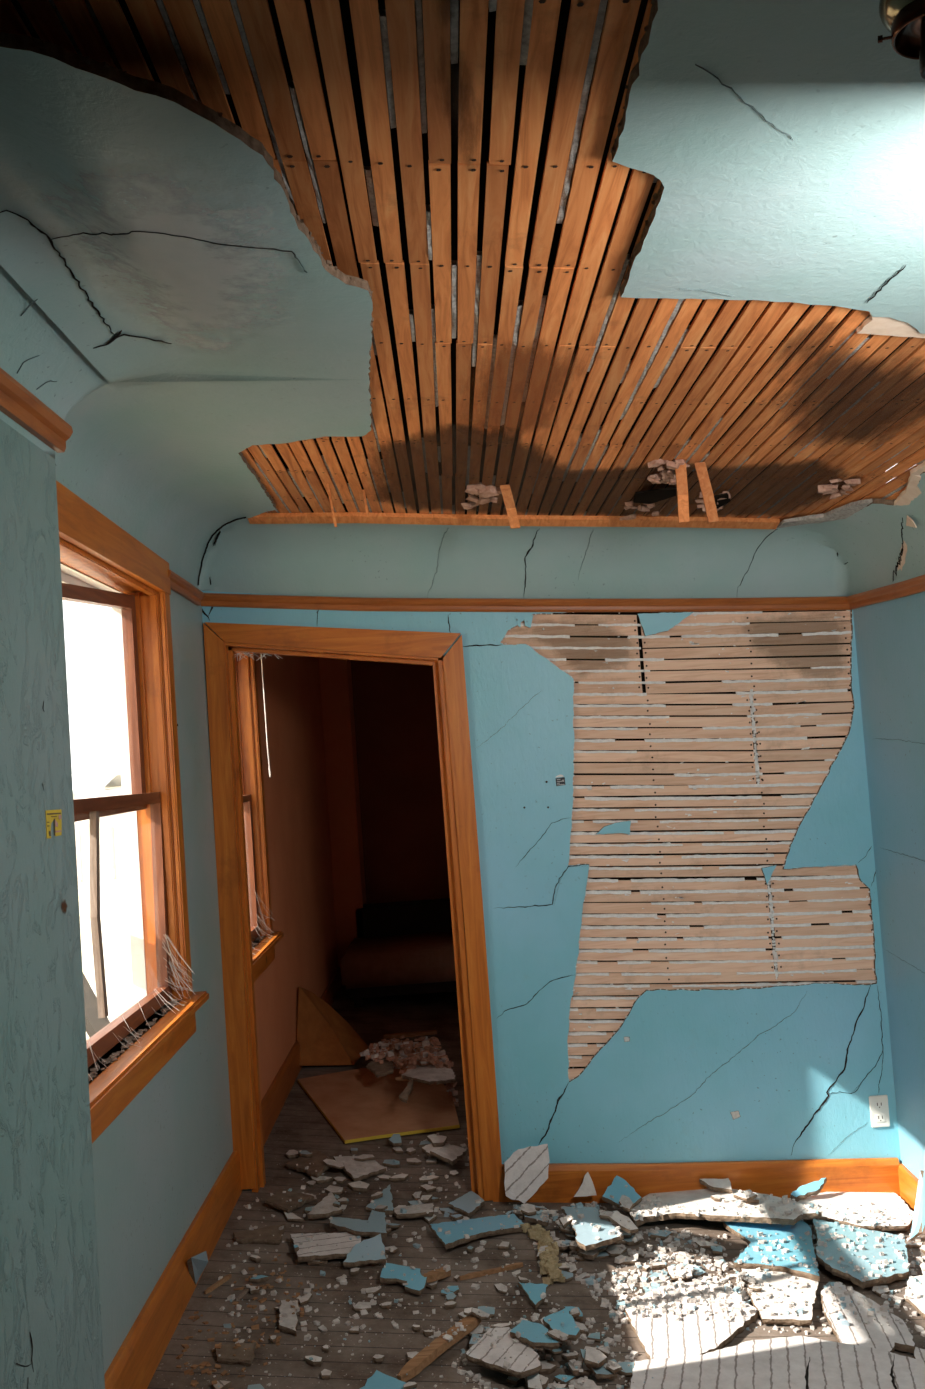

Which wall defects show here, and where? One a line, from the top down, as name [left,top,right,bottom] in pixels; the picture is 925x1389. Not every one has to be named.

crack [695,64,793,140]
crack [0,210,307,349]
spalling [0,0,925,529]
crack [867,266,905,303]
crack [17,355,57,390]
spalling [501,610,876,1081]
crack [498,864,584,908]
crack [498,975,571,1017]
crack [619,996,805,1142]
crack [539,1082,569,1144]